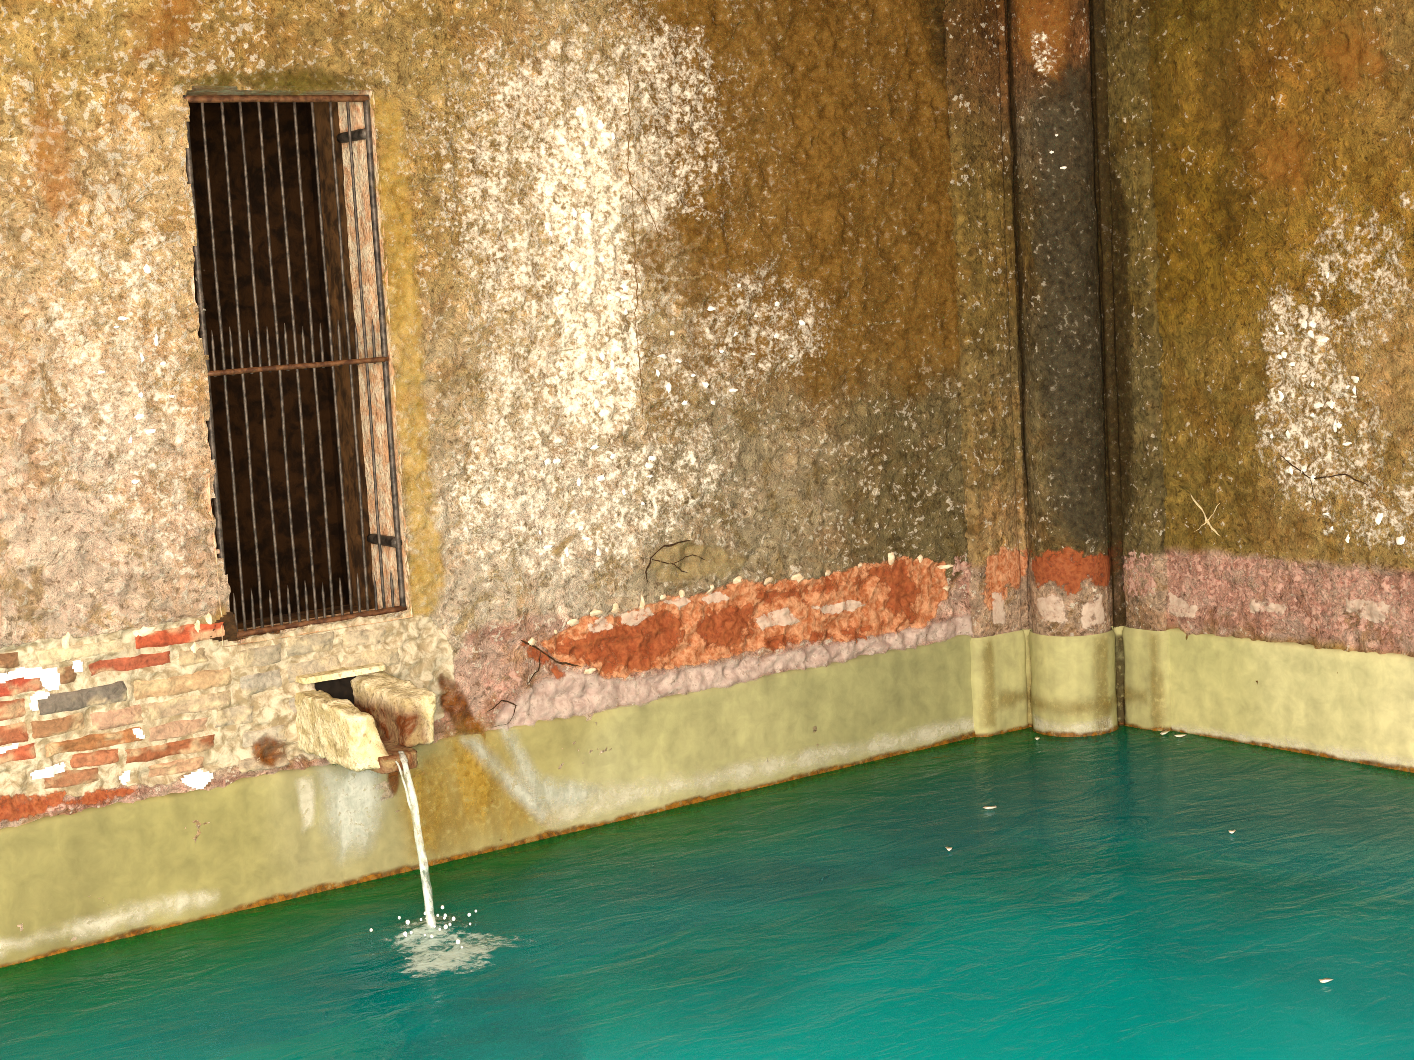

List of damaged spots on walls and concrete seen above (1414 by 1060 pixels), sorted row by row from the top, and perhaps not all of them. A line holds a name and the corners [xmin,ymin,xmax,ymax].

leakage [433,0,960,585]
leakage [1255,214,1414,545]
spalling [0,609,456,822]
peeling [482,546,1414,731]